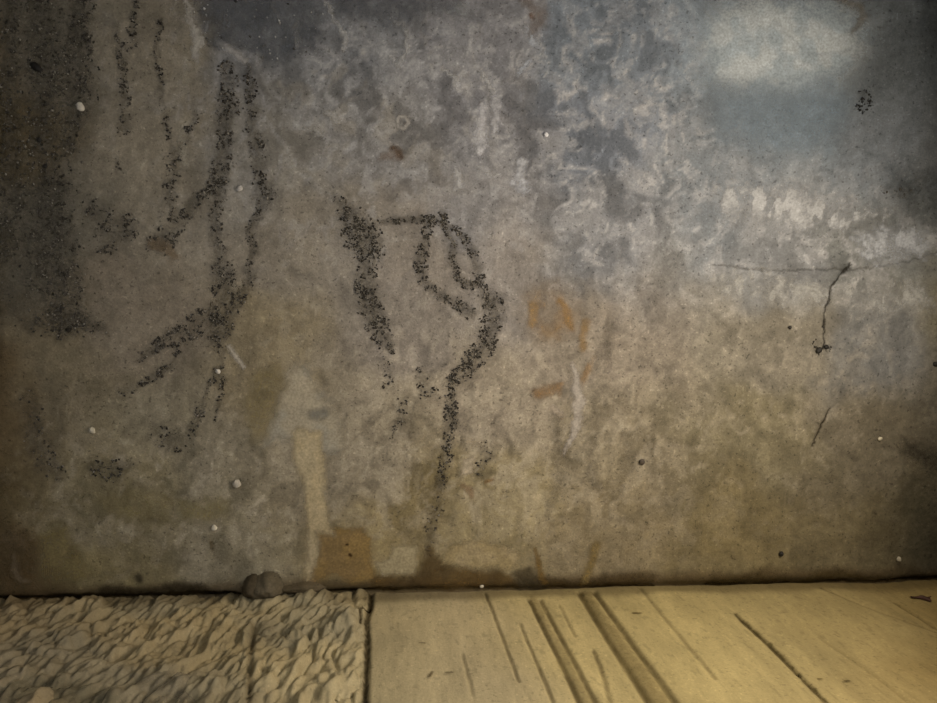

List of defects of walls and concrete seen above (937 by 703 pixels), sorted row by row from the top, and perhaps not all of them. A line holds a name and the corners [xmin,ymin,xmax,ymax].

damp [0,0,348,453]
damp [335,196,653,589]
damp [711,571,872,584]
crack [818,263,850,355]